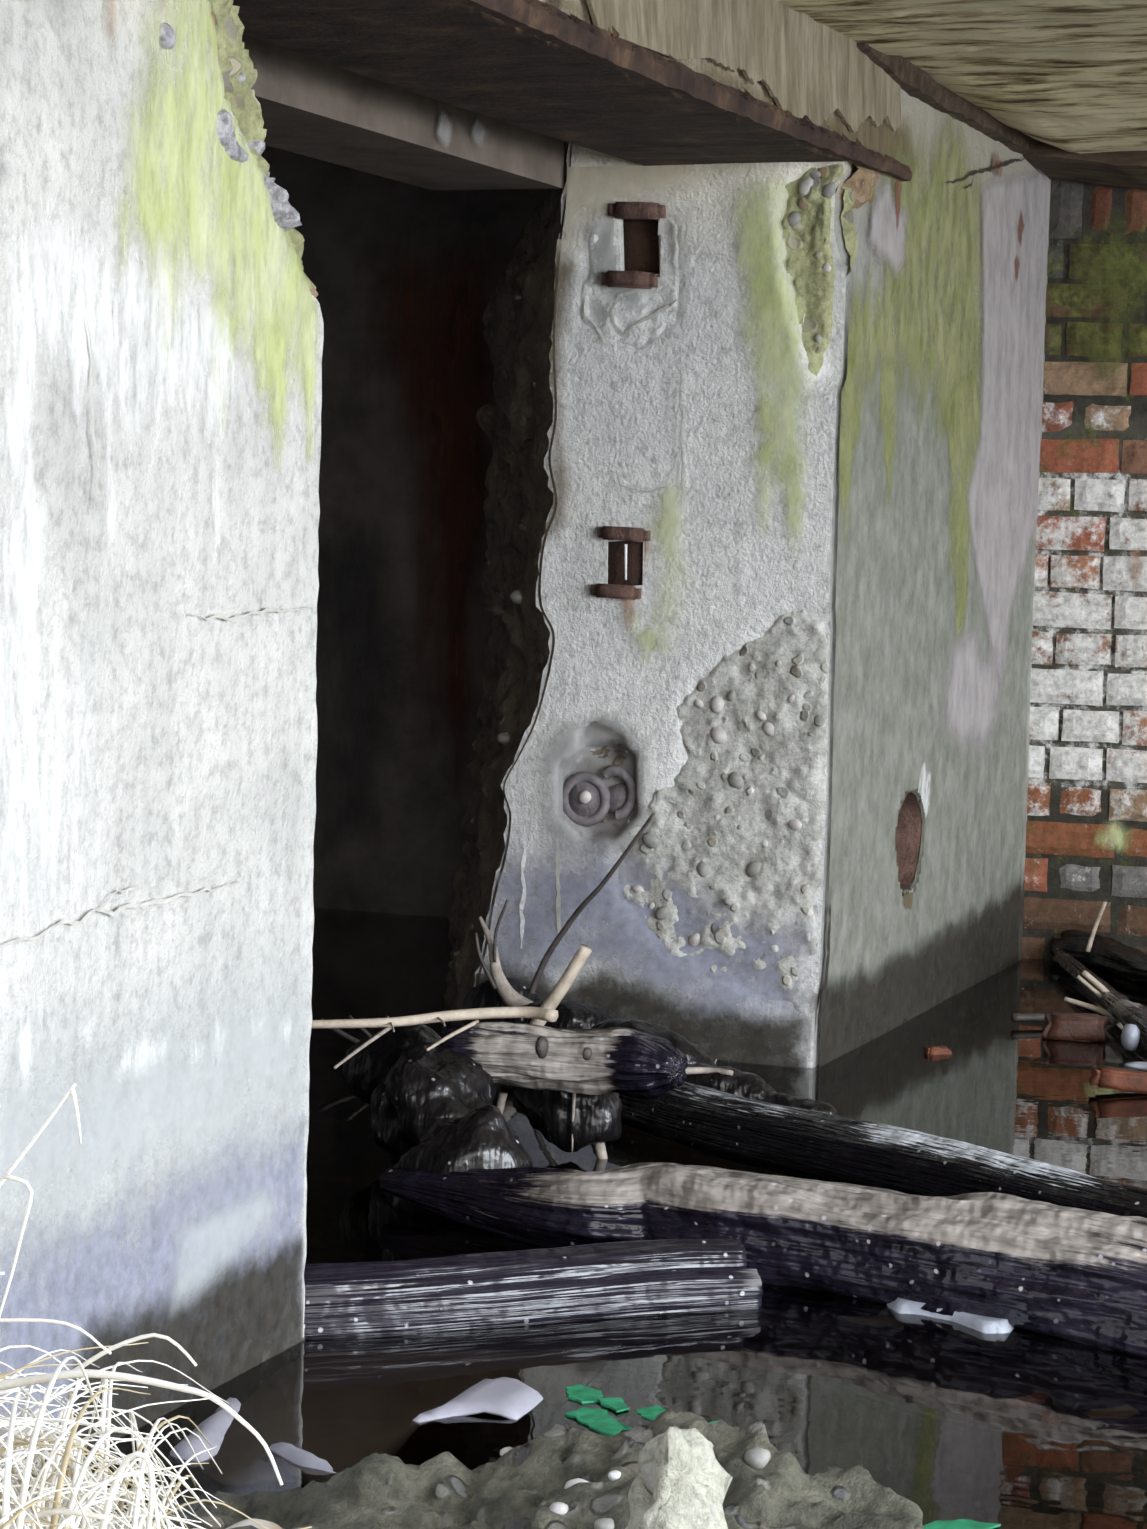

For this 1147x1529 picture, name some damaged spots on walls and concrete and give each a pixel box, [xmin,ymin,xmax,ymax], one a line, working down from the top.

peeling [159,22,176,50]
spalling [209,0,319,298]
leakage [710,71,778,107]
leakage [803,114,914,165]
spalling [580,214,679,348]
leakage [871,188,905,271]
leakage [839,359,861,516]
leakage [880,365,896,492]
spalling [444,142,572,1025]
spalling [586,610,830,1011]
leakage [476,721,1025,1069]